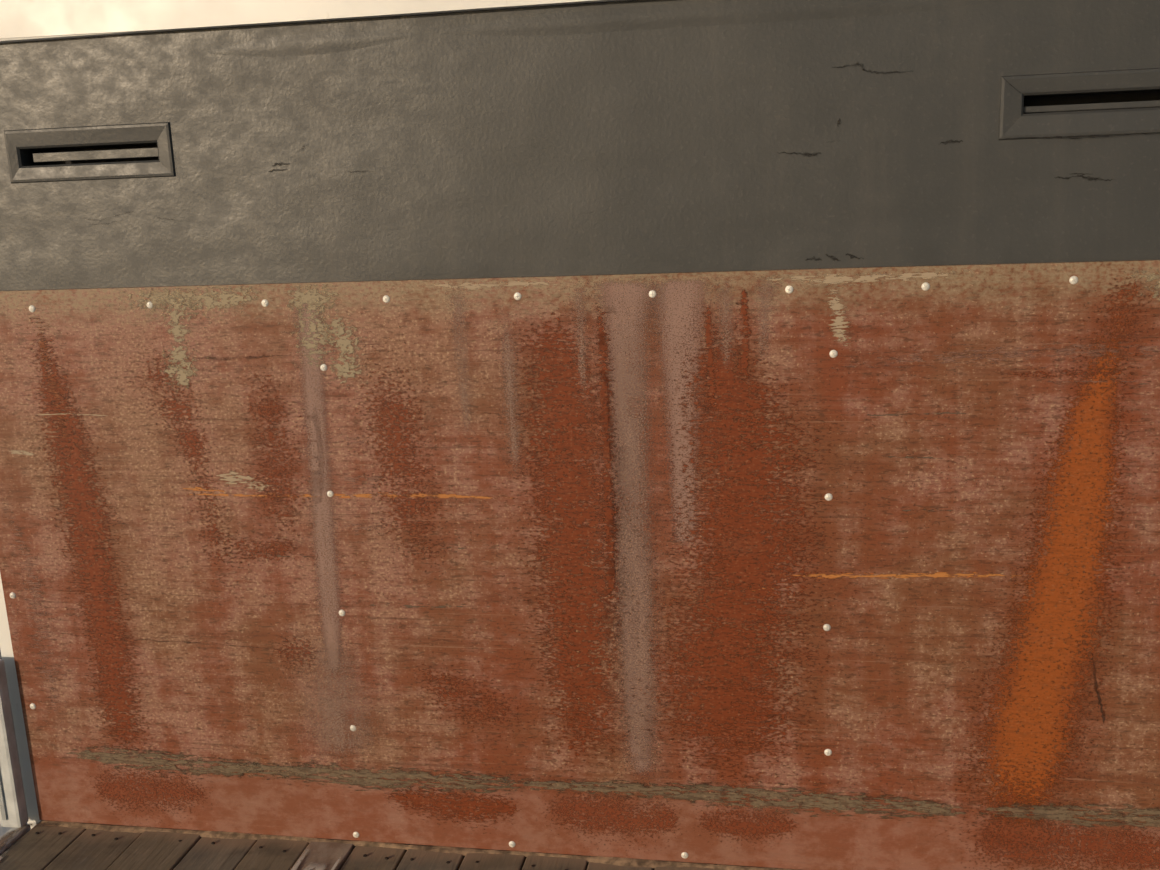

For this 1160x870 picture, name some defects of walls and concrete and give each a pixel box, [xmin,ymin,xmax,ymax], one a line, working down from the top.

corrosion [23,308,212,819]
damp [564,274,782,778]
corrosion [416,277,1160,870]